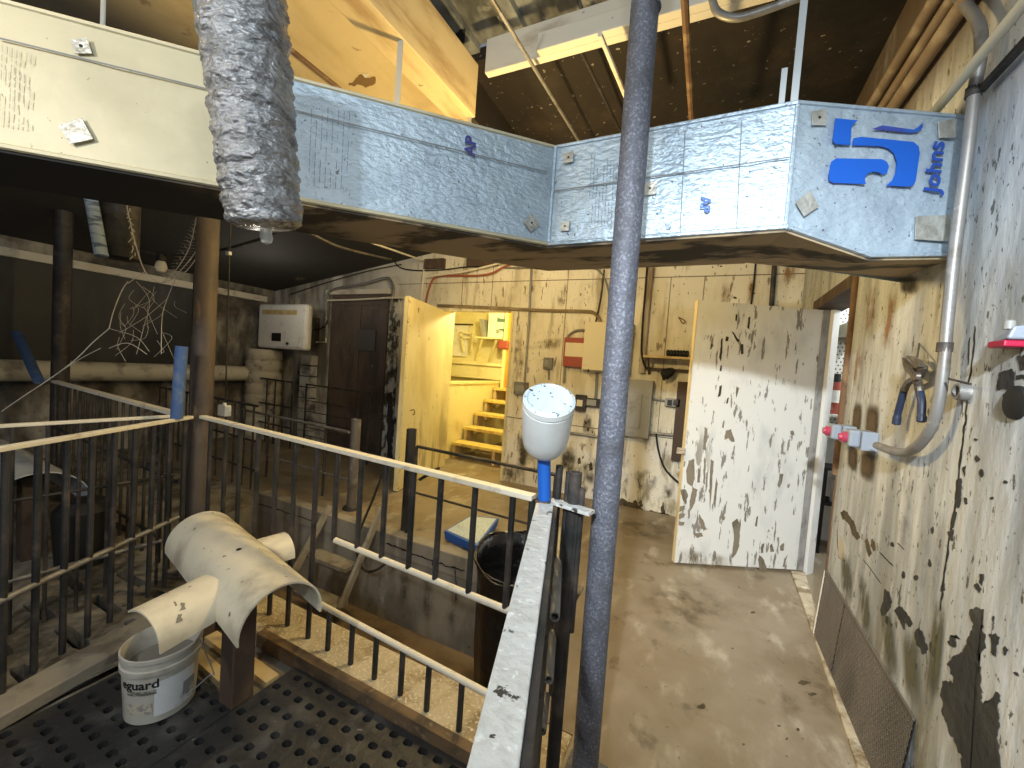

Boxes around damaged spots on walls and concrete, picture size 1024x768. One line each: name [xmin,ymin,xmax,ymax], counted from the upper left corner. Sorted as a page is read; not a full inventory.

peeling [710,314,750,371]
peeling [996,355,1024,397]
peeling [619,427,758,558]
crack [940,326,976,611]
peeling [744,543,787,571]
spalling [840,510,876,557]
peeling [880,589,1009,768]